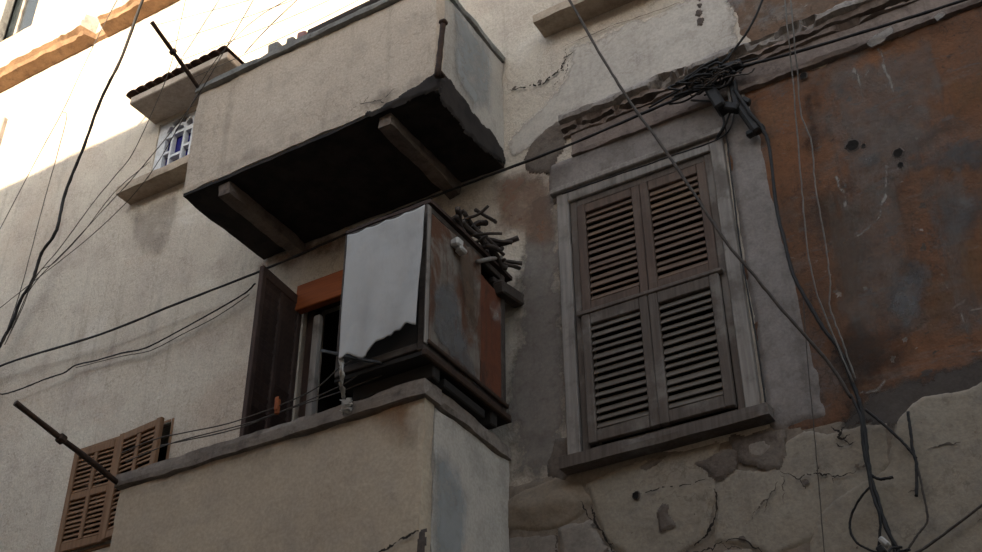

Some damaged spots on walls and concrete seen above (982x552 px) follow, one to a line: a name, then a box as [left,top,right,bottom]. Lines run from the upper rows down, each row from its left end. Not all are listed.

crack [506,1,682,92]
peeling [509,6,982,552]
crack [379,530,419,552]
crack [581,501,615,552]
crack [641,425,866,552]